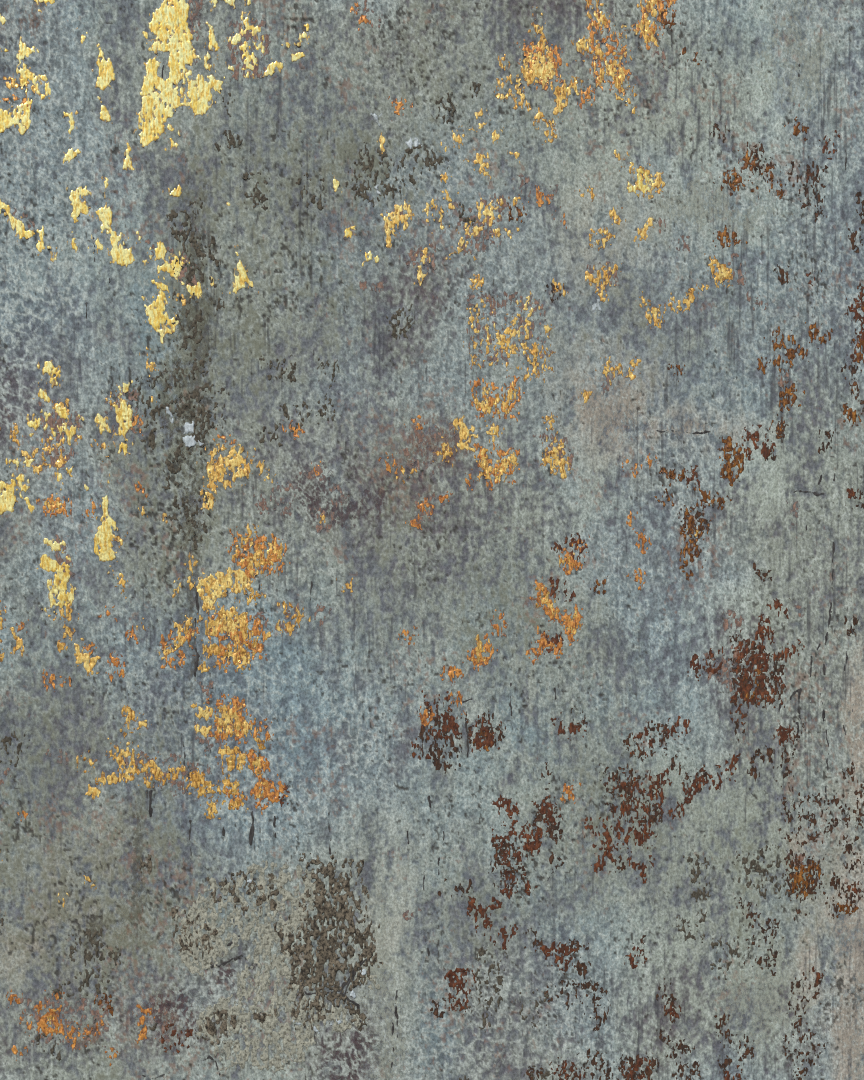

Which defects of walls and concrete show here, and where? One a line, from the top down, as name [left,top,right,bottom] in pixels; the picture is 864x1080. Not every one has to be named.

corrosion [773,264,790,285]
corrosion [622,322,833,582]
corrosion [626,568,647,590]
corrosion [489,609,508,637]
corrosion [410,659,506,774]
corrosion [584,598,864,923]
corrosion [438,762,611,1031]
corrosion [430,965,477,1018]
corrosion [624,935,650,969]
corrosion [734,897,784,976]